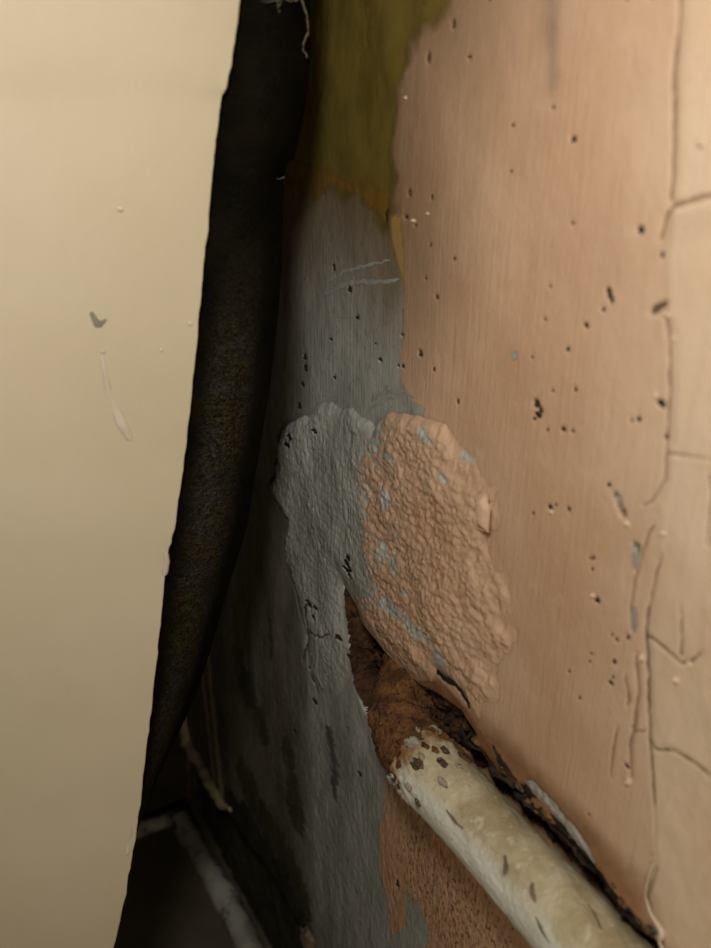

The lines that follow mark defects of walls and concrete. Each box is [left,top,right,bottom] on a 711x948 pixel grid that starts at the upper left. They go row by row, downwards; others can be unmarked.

leakage [284,0,448,282]
crack [661,0,711,238]
peeling [186,174,429,948]
crack [611,301,711,806]
spalling [428,689,477,747]